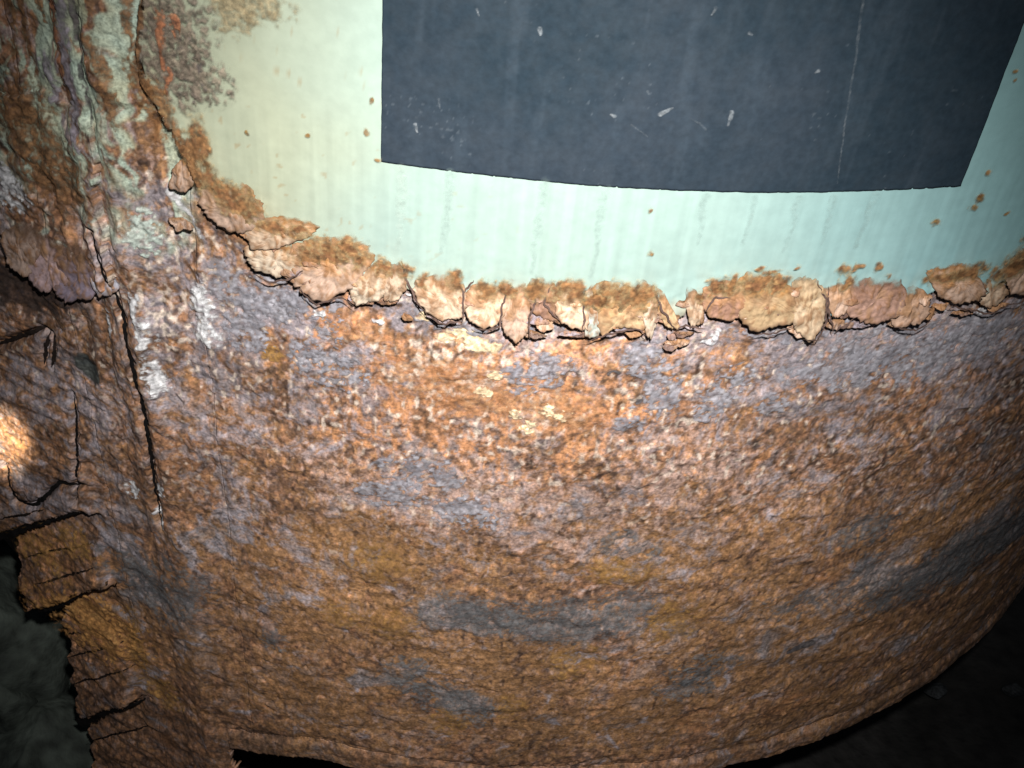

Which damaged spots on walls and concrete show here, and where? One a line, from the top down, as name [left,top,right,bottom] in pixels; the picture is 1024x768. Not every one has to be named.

rust [0,0,428,290]
rust [449,269,463,291]
rust [477,278,658,313]
peeling [168,159,1024,354]
rust [695,266,800,303]
rust [838,262,891,292]
rust [923,251,1024,286]
rust [320,308,392,349]
crack [91,232,162,526]
rust [393,350,606,431]
rust [22,582,184,711]